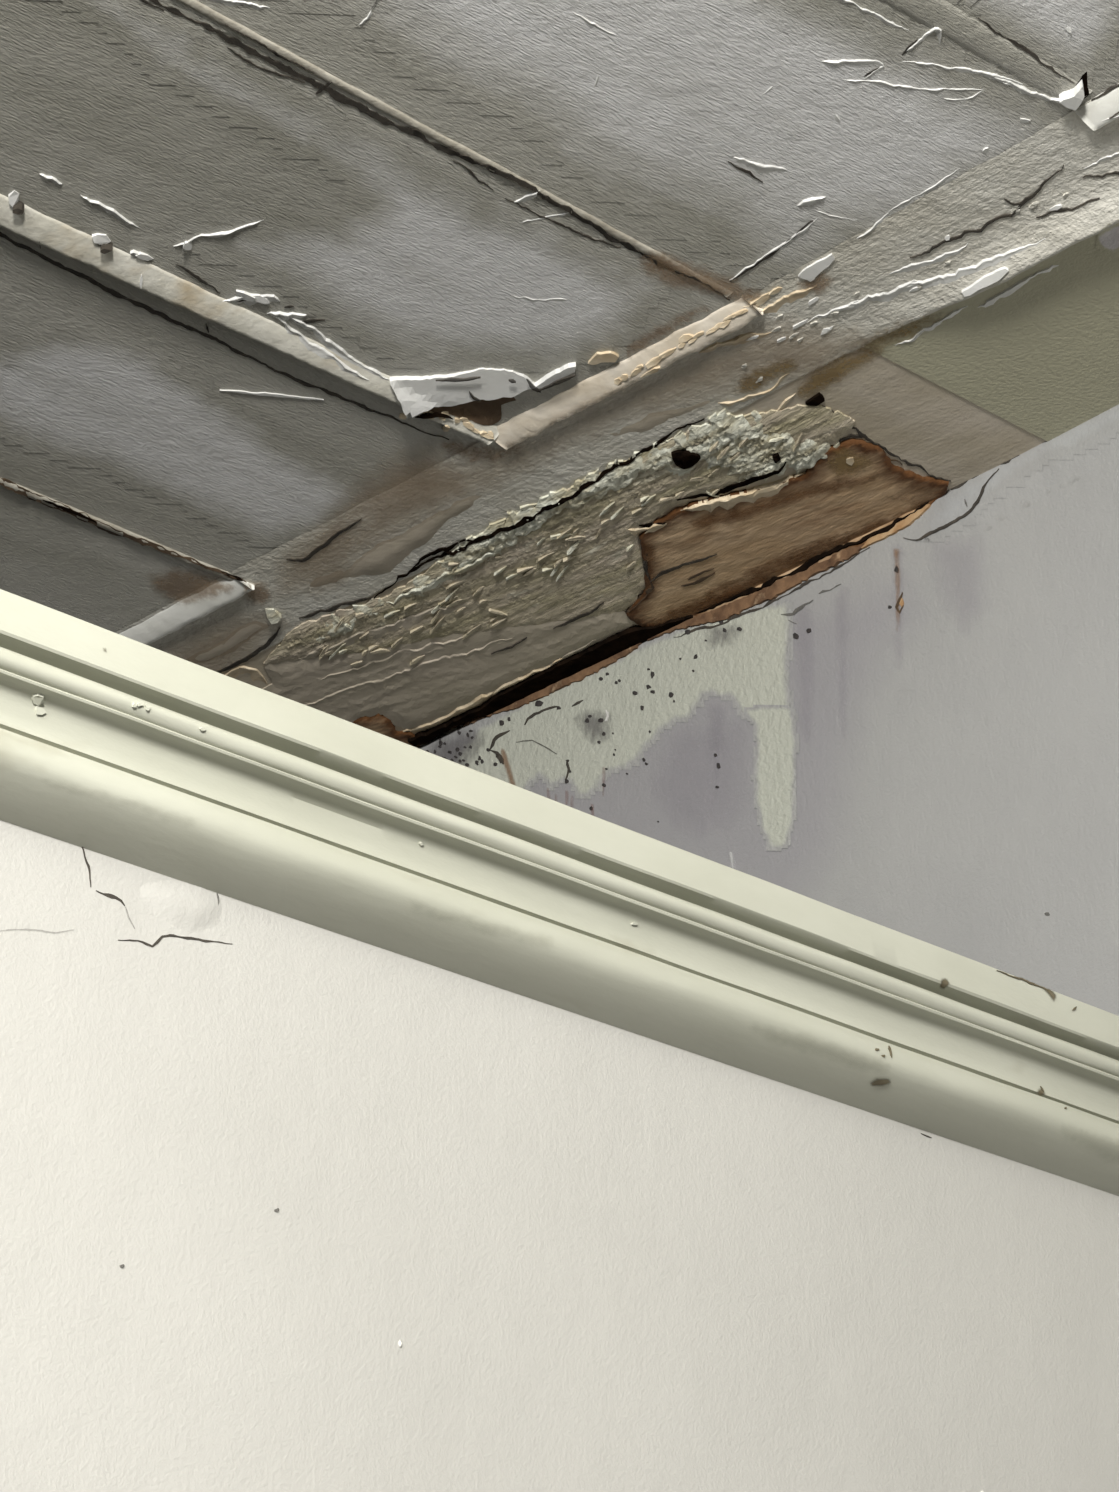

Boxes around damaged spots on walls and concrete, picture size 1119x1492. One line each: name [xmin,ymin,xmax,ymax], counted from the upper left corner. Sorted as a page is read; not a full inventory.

peeling [211,0,270,10]
peeling [820,0,1084,110]
peeling [8,190,24,215]
peeling [80,195,138,228]
peeling [92,233,154,261]
peeling [728,157,787,183]
peeling [729,169,958,282]
peeling [174,220,1059,439]
peeling [185,363,949,851]
leakage [418,717,511,767]
leakage [528,548,947,907]
crack [81,847,231,947]